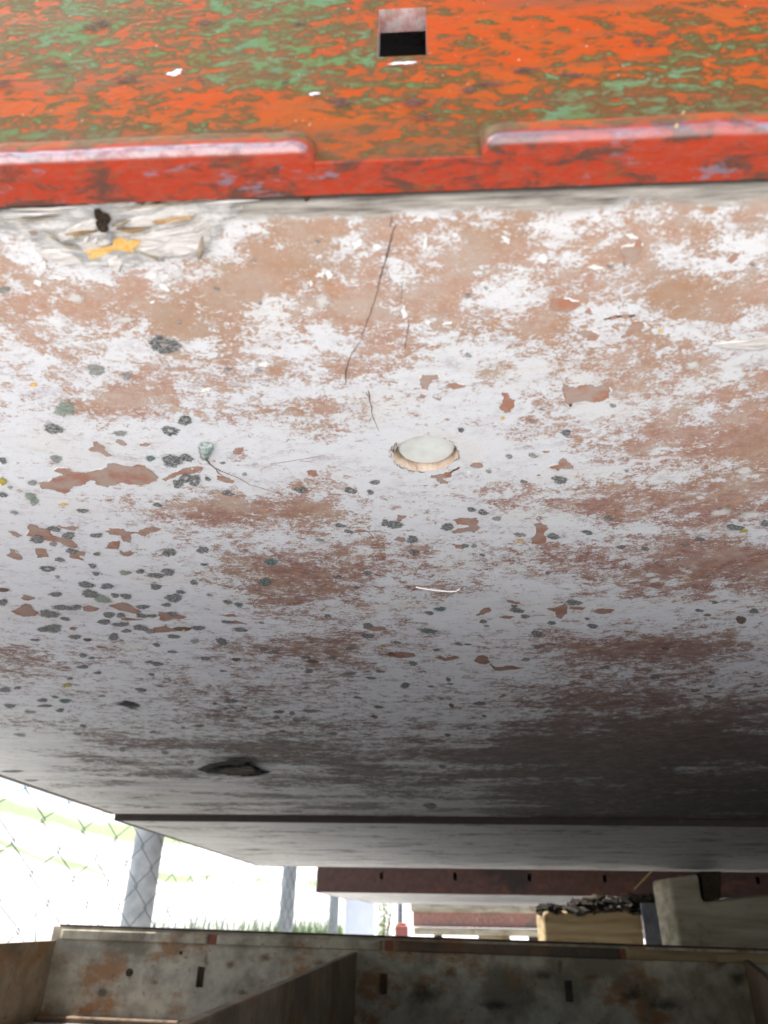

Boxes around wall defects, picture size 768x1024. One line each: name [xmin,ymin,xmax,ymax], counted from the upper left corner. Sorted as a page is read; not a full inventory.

spalling [0,198,258,304]
crack [345,215,409,428]
peeling [562,384,613,408]
peeling [39,439,204,494]
spalling [198,760,269,777]